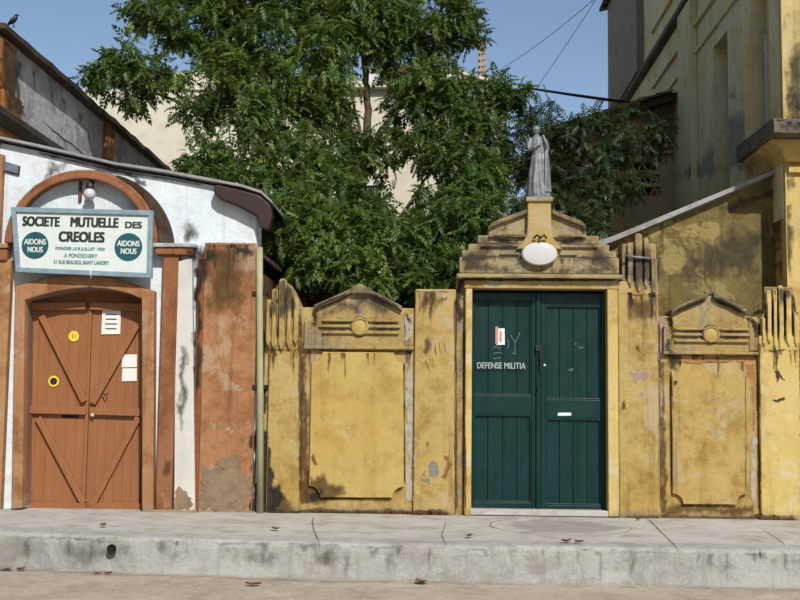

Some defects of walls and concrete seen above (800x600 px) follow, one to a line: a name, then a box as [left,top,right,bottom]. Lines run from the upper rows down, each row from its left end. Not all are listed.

leakage [777,52,800,128]
leakage [624,249,660,284]
leakage [687,234,761,276]
peeling [403,314,414,340]
leakage [249,282,448,515]
peeling [405,352,439,501]
leakage [415,229,615,508]
leakage [626,289,798,521]
spalling [173,454,251,512]